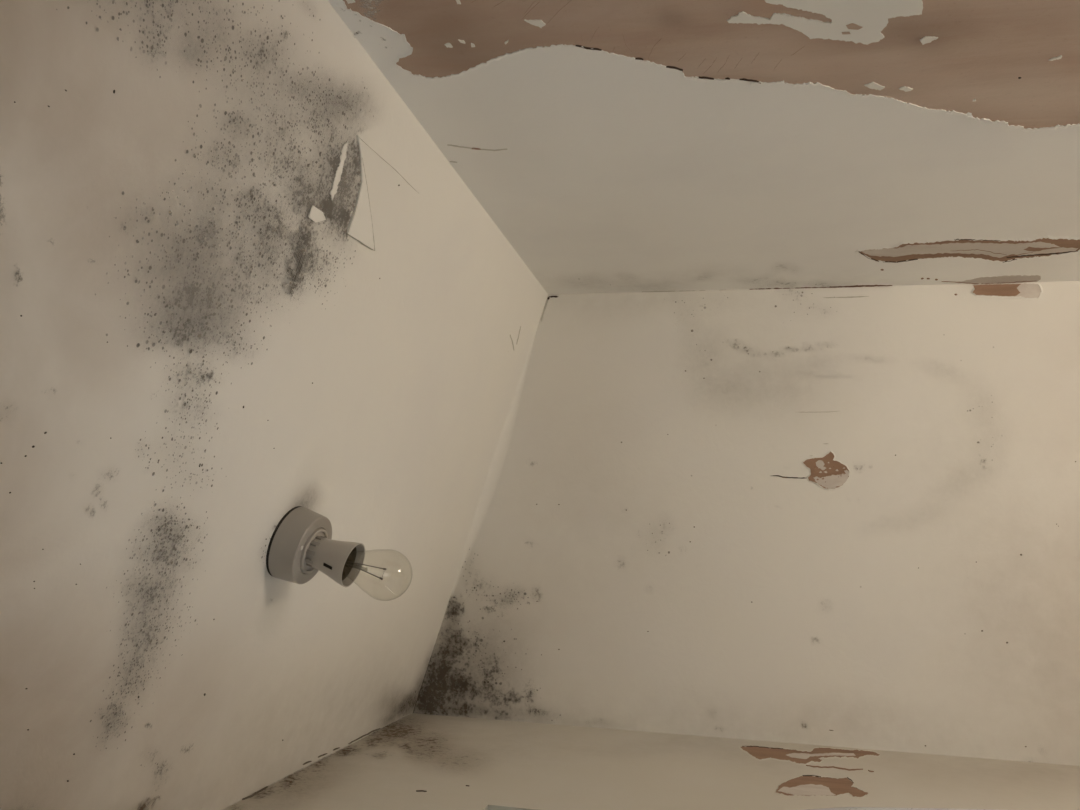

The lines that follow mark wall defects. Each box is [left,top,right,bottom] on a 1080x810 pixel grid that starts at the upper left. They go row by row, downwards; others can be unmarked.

peeling [339,0,1080,132]
peeling [854,235,1080,271]
peeling [921,275,1043,300]
water stain [86,0,369,749]
spalling [802,450,851,491]
water stain [338,561,538,757]
peeling [739,744,881,799]